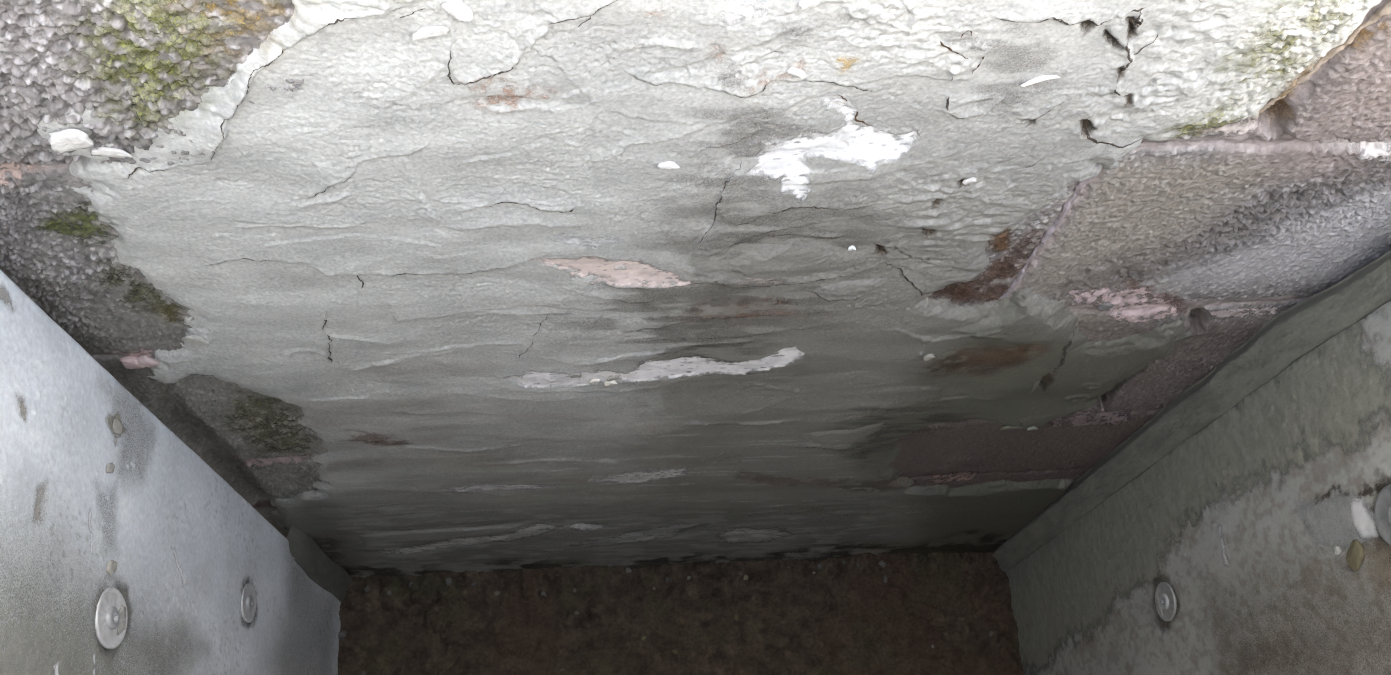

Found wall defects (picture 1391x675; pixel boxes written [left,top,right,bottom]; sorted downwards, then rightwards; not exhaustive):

crack [551,0,617,27]
spalling [1081,16,1137,48]
crack [447,51,520,86]
crack [940,7,1158,119]
peeling [48,129,133,158]
peeling [748,93,917,201]
crack [809,81,874,126]
crack [1034,99,1147,148]
peeling [1351,141,1391,161]
rust [932,228,1043,303]
peeling [1068,287,1179,323]
peeling [506,347,804,389]